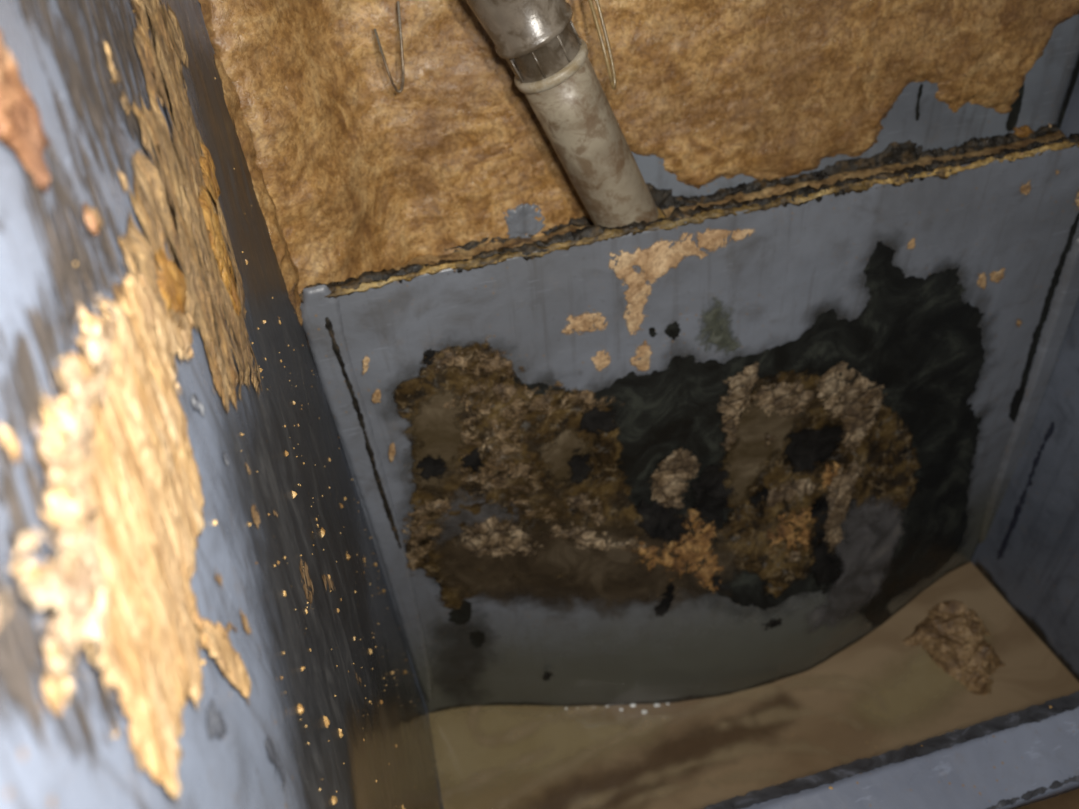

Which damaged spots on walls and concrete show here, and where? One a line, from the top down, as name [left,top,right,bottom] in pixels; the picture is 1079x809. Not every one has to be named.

corrosion [0,30,52,192]
corrosion [84,203,103,235]
peeling [0,0,251,799]
corrosion [103,0,289,414]
corrosion [214,54,303,326]
peeling [424,339,525,386]
water stain [186,47,1079,809]
corrosion [632,509,724,592]
corrosion [609,228,755,371]
spalling [635,447,737,549]
peeling [717,362,815,451]
peeling [751,423,902,631]